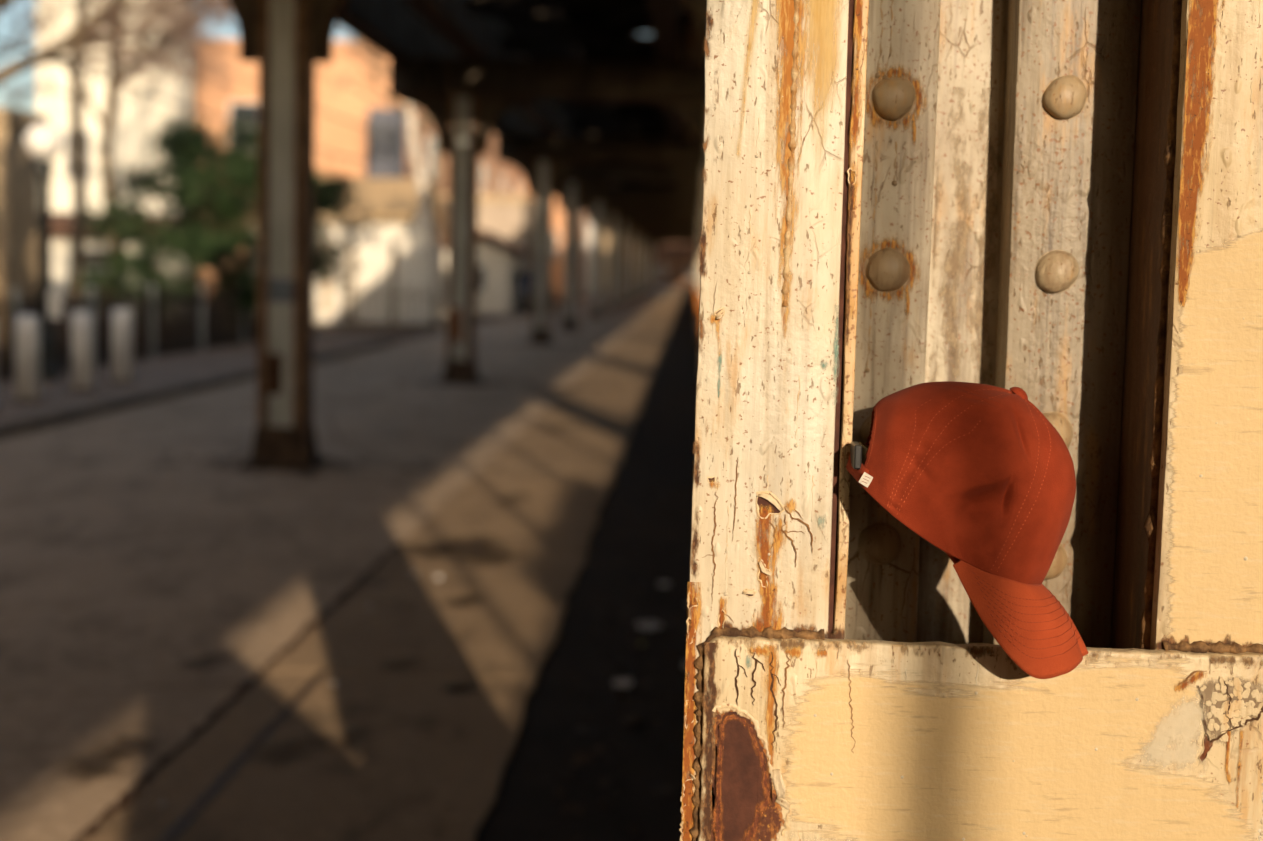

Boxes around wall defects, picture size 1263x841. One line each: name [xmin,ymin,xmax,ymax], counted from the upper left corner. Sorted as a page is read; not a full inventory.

corrosion [849,0,925,148]
corrosion [776,0,808,334]
corrosion [1176,0,1224,307]
corrosion [696,212,720,353]
corrosion [845,166,919,345]
crack [701,457,790,750]
peeling [756,491,785,519]
corrosion [681,499,868,841]
crack [768,507,813,567]
corrosion [1174,635,1263,691]
crack [1178,671,1263,742]
corrosion [1226,731,1243,808]